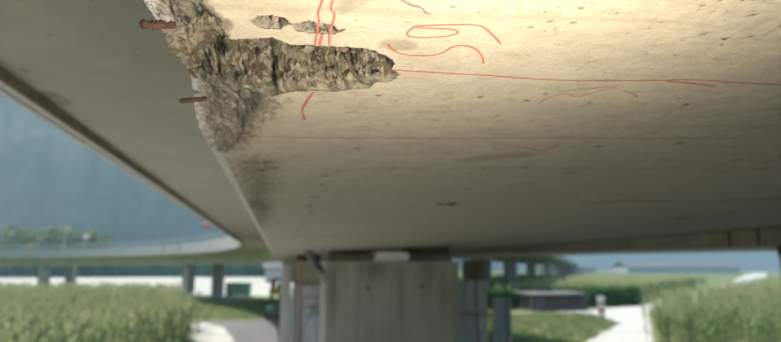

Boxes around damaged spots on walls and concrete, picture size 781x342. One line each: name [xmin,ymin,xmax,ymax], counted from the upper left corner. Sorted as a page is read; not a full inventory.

spalling [139,0,400,153]